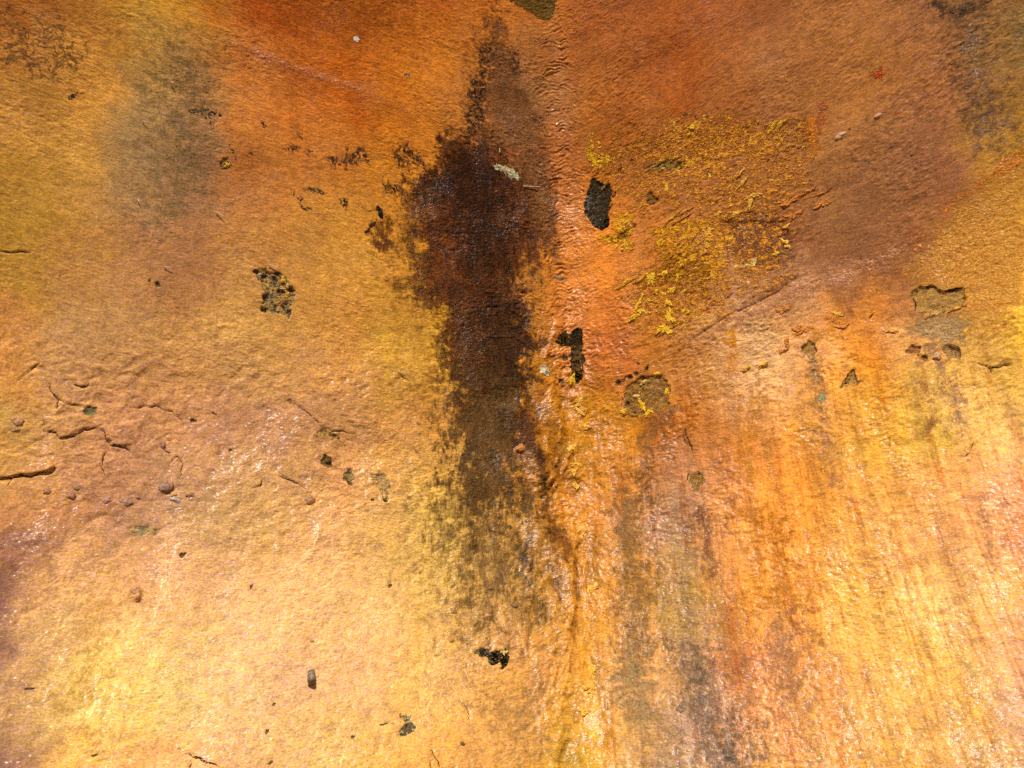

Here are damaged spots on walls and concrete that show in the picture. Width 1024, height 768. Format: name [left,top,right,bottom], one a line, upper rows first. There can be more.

peeling [583,105,832,359]
spalling [252,268,297,318]
spalling [910,284,967,320]
spalling [905,345,928,360]
spalling [942,344,961,359]
spalling [555,328,592,430]
spalling [615,363,671,417]
peeling [567,444,583,491]
rust [514,406,579,637]
spalling [474,647,509,669]